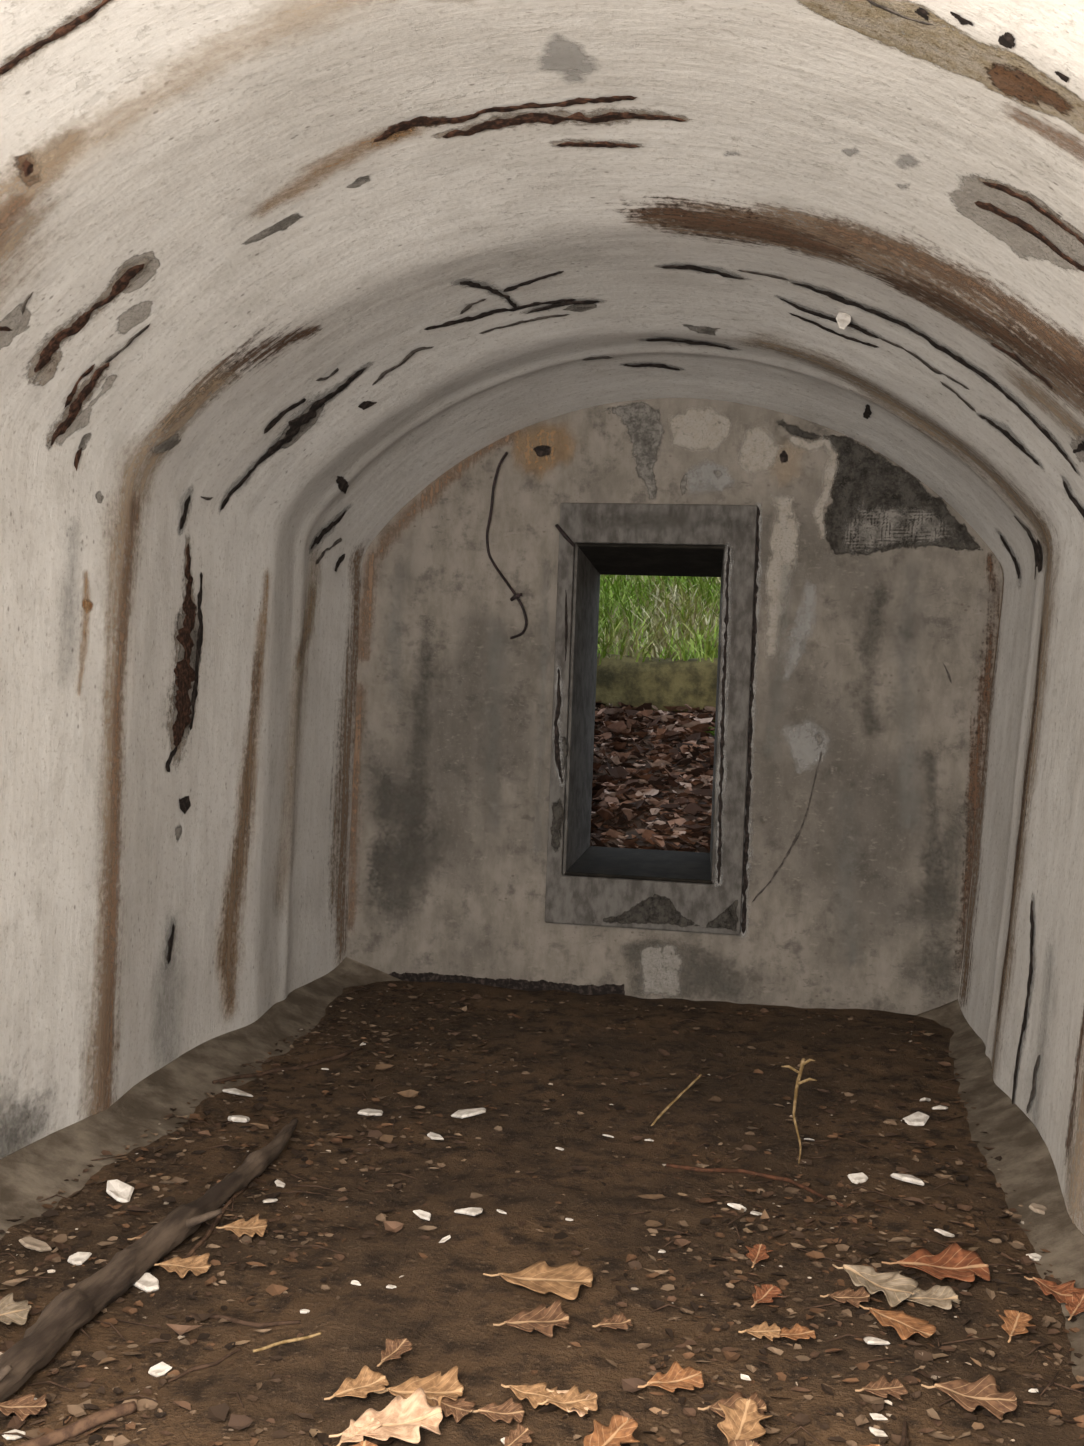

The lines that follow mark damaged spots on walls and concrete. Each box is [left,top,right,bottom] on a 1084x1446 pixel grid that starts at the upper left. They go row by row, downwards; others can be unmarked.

crack [0,0,113,76]
spalling [797,0,1084,159]
crack [179,271,603,534]
peeling [766,495,815,678]
spalling [608,402,980,555]
corrosion [623,197,1084,438]
crack [658,264,1084,518]
corrosion [78,325,322,1117]
peeling [786,723,827,770]
corrosion [749,338,1052,1075]
crack [1012,897,1040,1113]
corrosion [1065,1009,1084,1236]